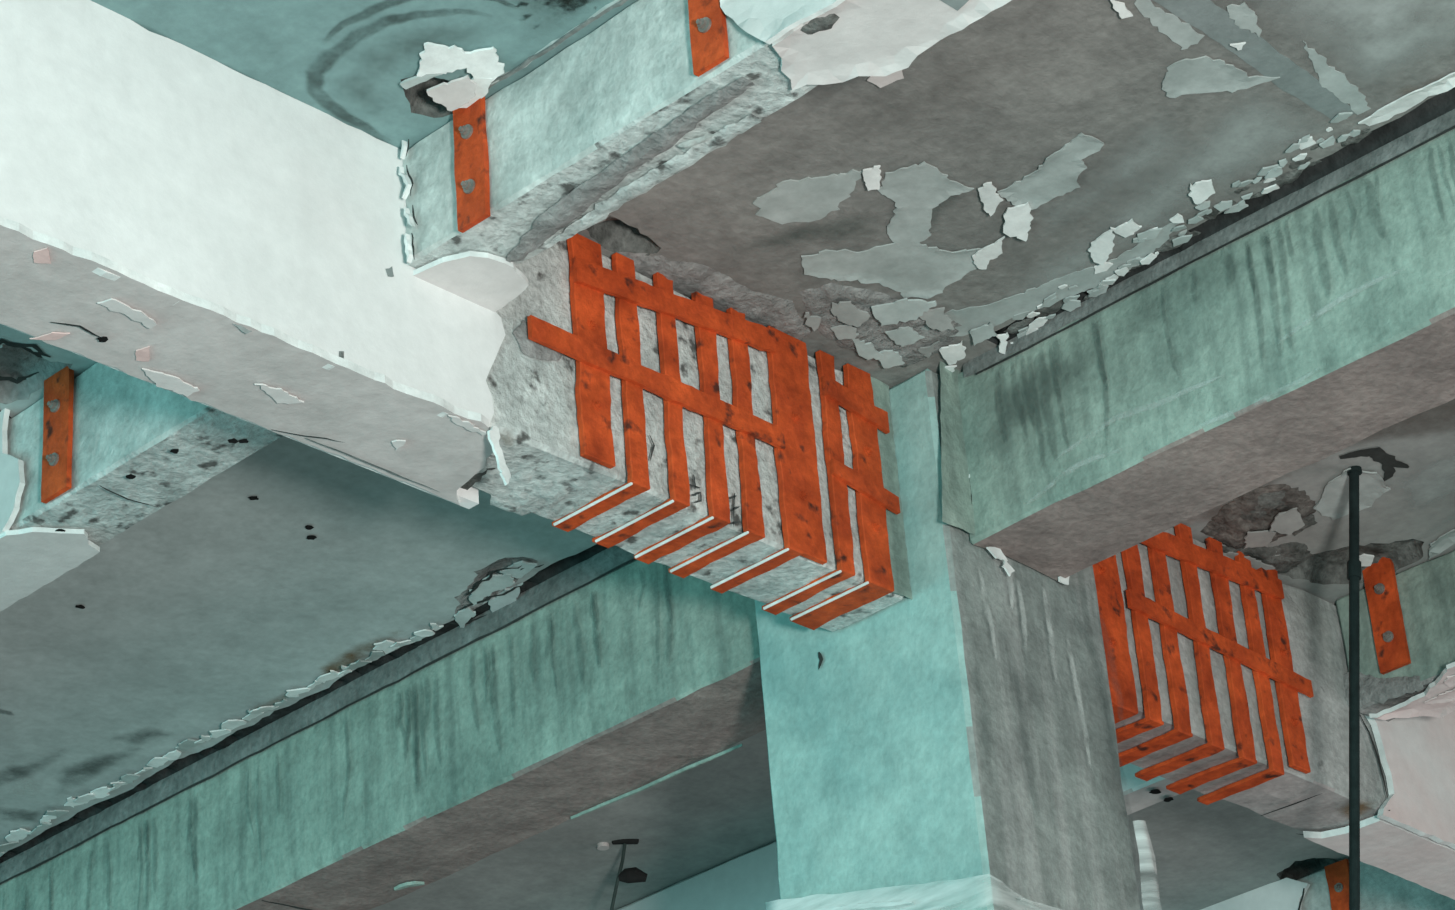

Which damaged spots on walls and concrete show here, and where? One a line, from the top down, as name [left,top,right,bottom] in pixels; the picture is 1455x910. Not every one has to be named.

peeling [400,42,505,118]
spalling [801,14,840,34]
peeling [1110,0,1280,98]
peeling [1300,0,1455,69]
peeling [506,41,1455,372]
spalling [0,332,73,404]
peeling [97,298,200,397]
peeling [306,438,439,492]
spalling [1200,468,1455,585]
peeling [0,557,544,857]
peeling [571,744,742,820]
peeling [394,881,425,891]